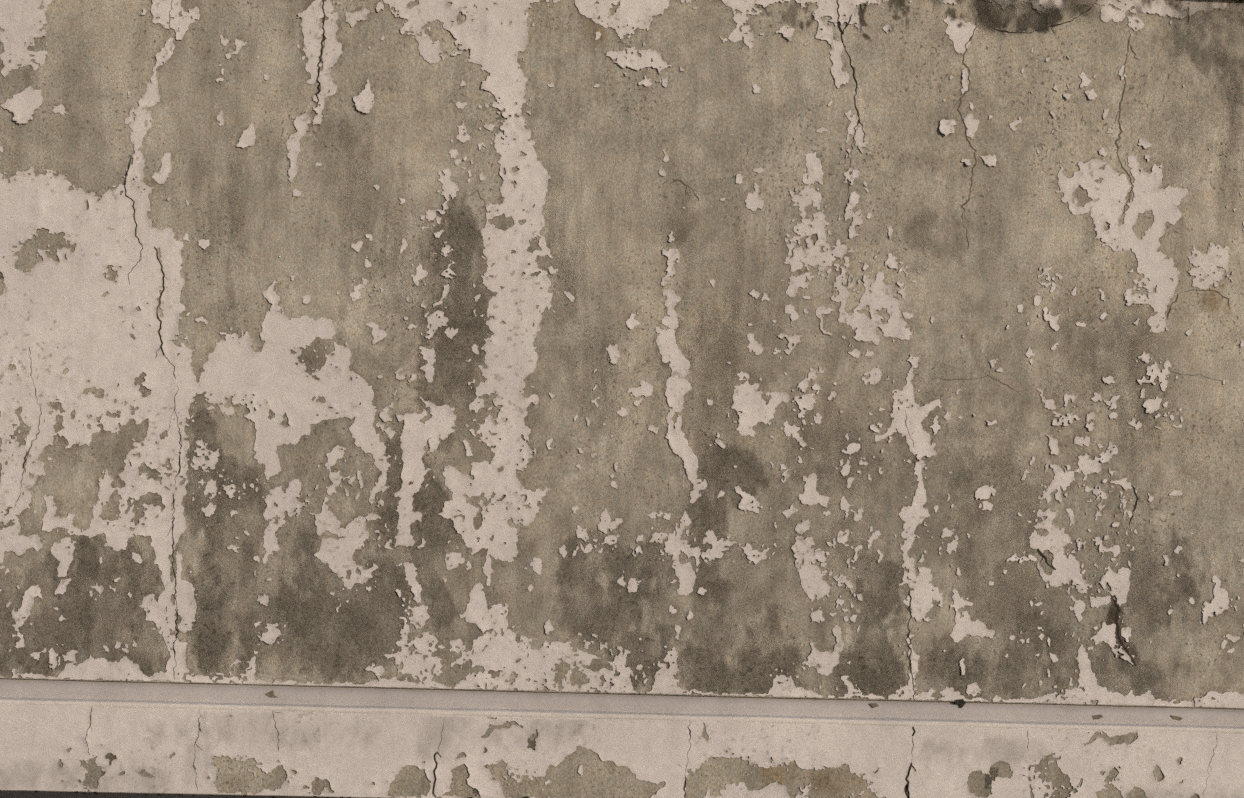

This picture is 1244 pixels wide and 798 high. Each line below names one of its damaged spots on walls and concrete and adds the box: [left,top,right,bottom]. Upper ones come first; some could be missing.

peeling [773,152,919,359]
crack [837,3,865,193]
leakage [859,2,868,38]
leakage [976,0,1062,32]
crack [952,0,1098,253]
peeling [1048,72,1244,333]
crack [123,156,182,679]
peeling [728,366,863,522]
peeling [862,354,996,658]
peeling [1003,388,1138,622]
crack [904,590,916,798]
crack [1114,597,1136,665]